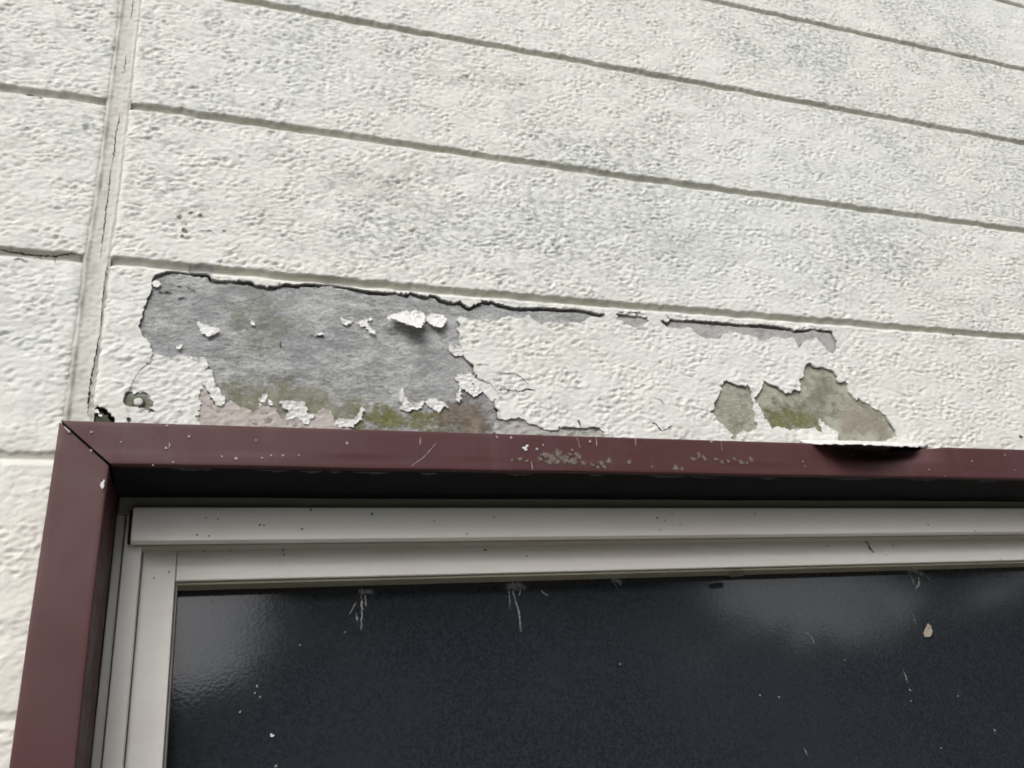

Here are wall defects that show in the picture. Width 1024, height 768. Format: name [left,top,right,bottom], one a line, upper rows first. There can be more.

crack [0,112,120,413]
peeling [93,265,648,437]
peeling [661,319,836,353]
peeling [710,363,896,451]